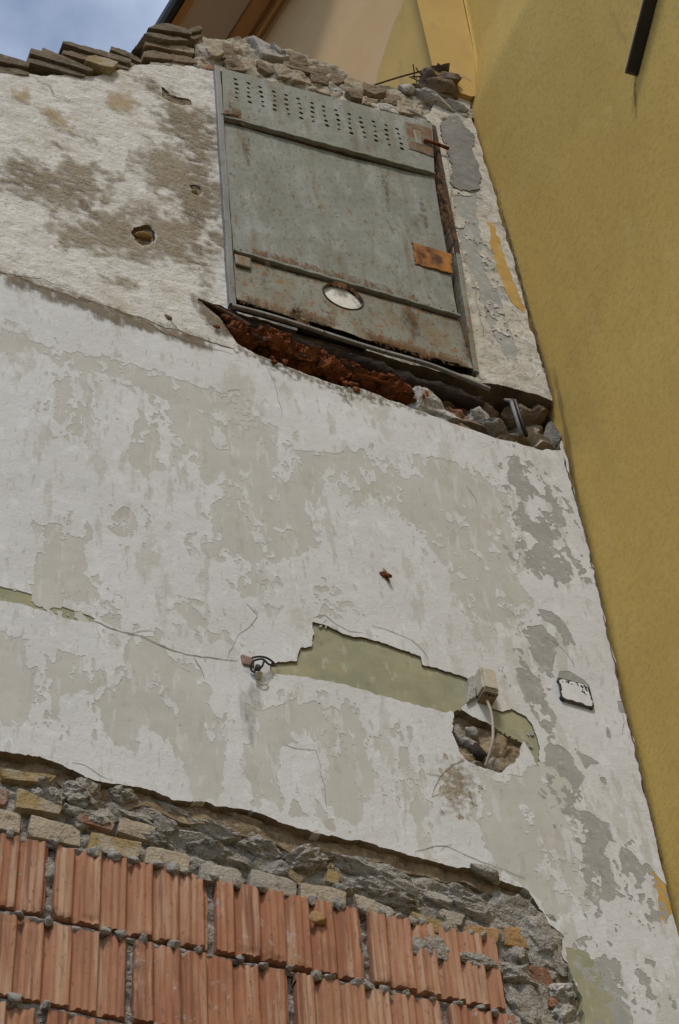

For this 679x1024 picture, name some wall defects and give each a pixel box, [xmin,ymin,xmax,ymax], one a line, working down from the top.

spalling [192,36,355,104]
spalling [0,76,224,297]
peeling [370,83,524,364]
rust [191,293,429,415]
rust [251,249,471,367]
crack [0,587,258,676]
peeling [0,319,672,932]